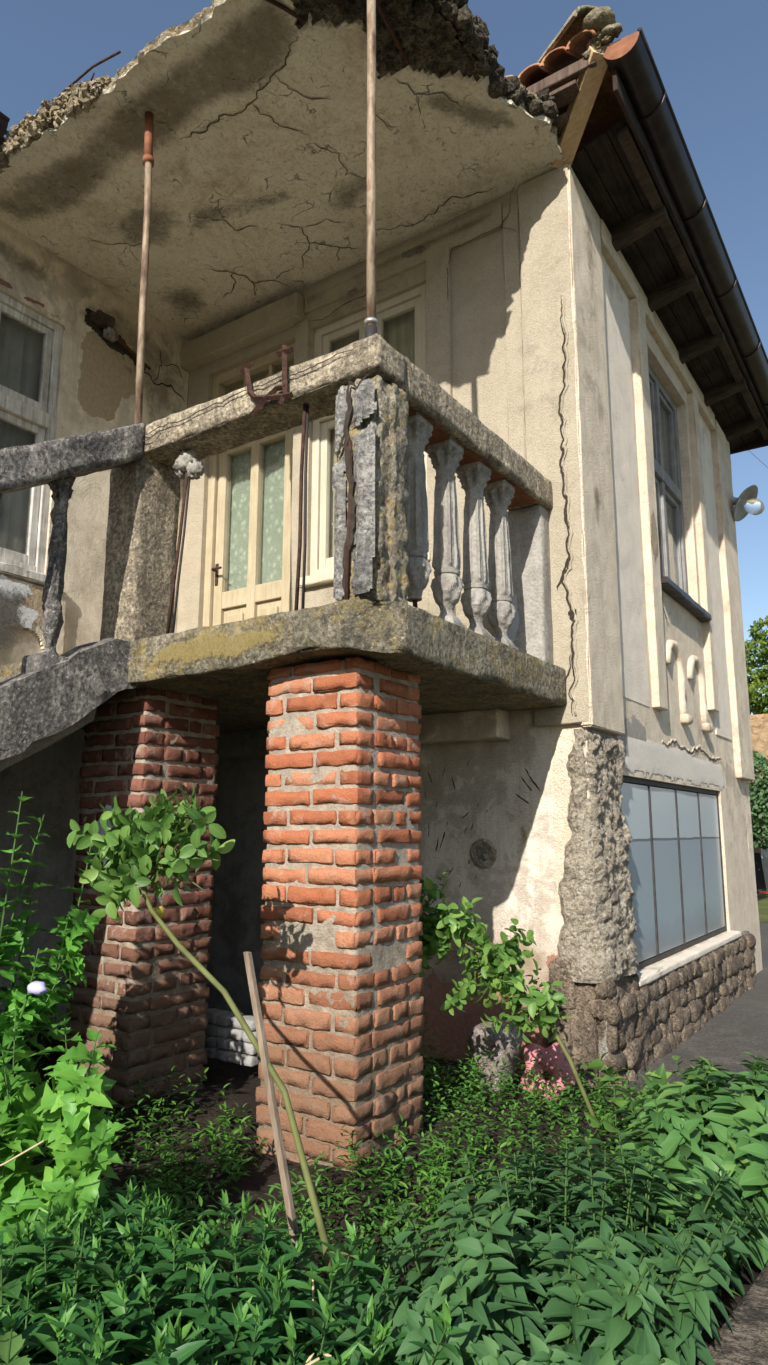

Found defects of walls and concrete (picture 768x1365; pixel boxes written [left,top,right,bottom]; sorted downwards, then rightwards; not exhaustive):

spalling [0,50,121,174]
water stain [1,6,287,216]
crack [181,36,365,179]
flaking render [0,278,65,330]
peeling [78,308,151,421]
water stain [122,210,172,242]
crack [193,187,516,309]
crack [556,294,579,716]
peeling [0,574,44,630]
spalling [546,729,639,984]
flaking render [423,970,546,1072]